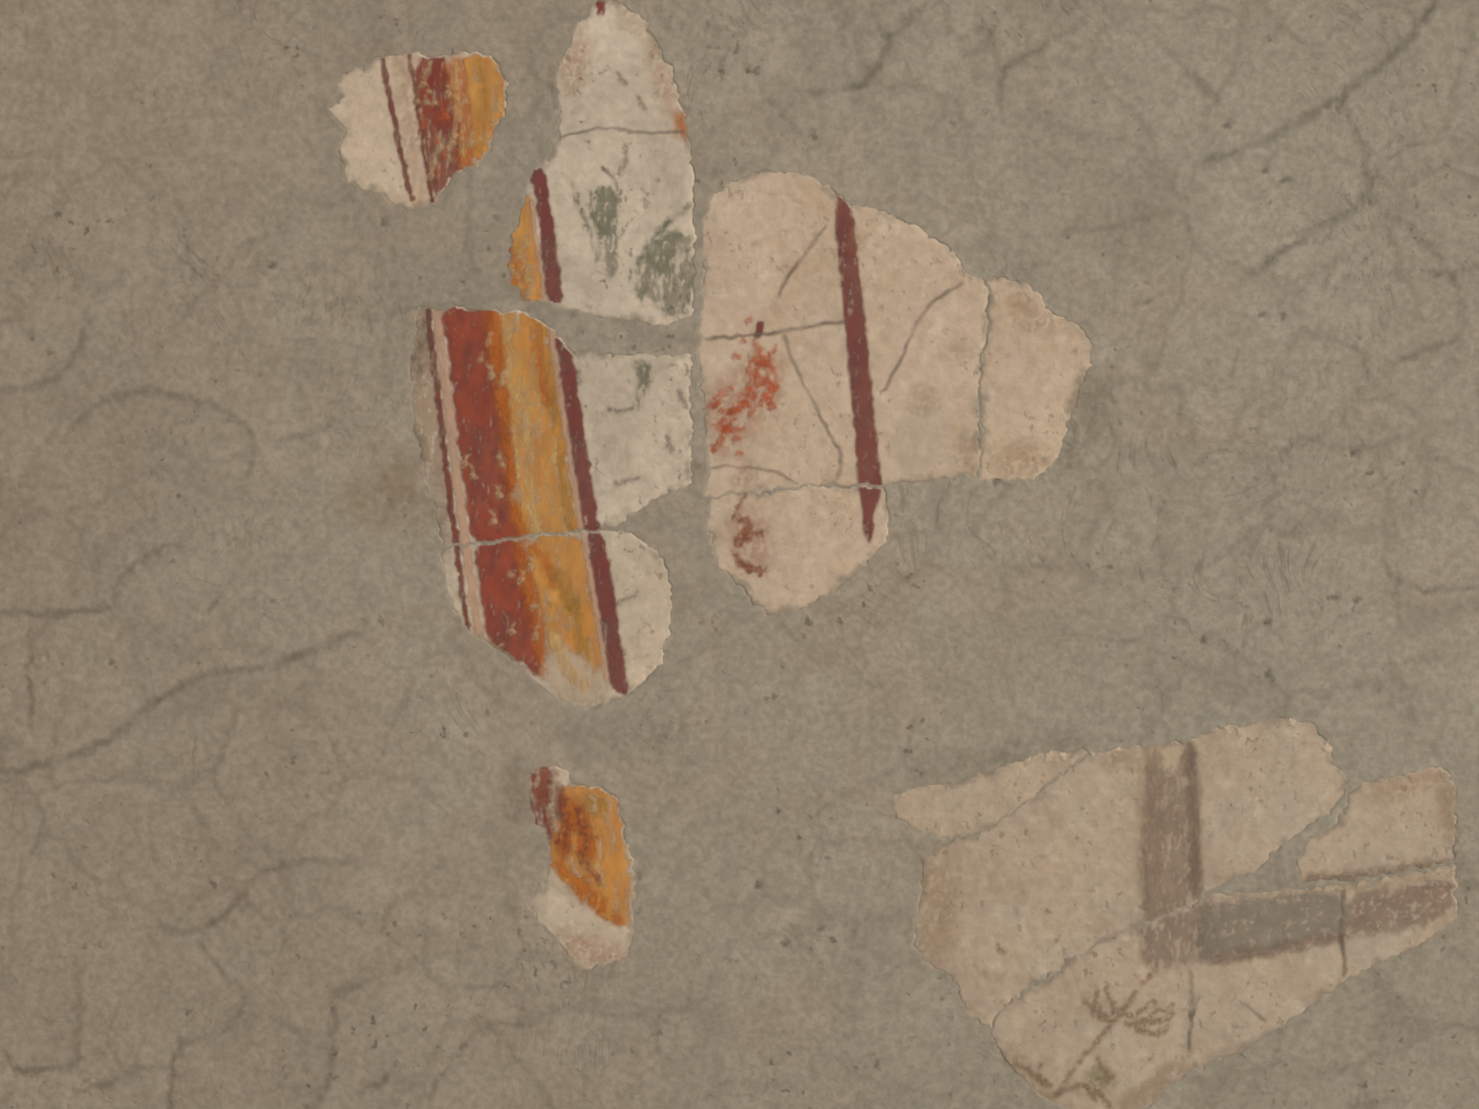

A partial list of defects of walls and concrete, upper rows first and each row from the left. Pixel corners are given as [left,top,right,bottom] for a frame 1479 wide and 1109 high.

crack [713,321,844,341]
crack [1339,933,1347,973]
crack [1188,1008,1196,1048]